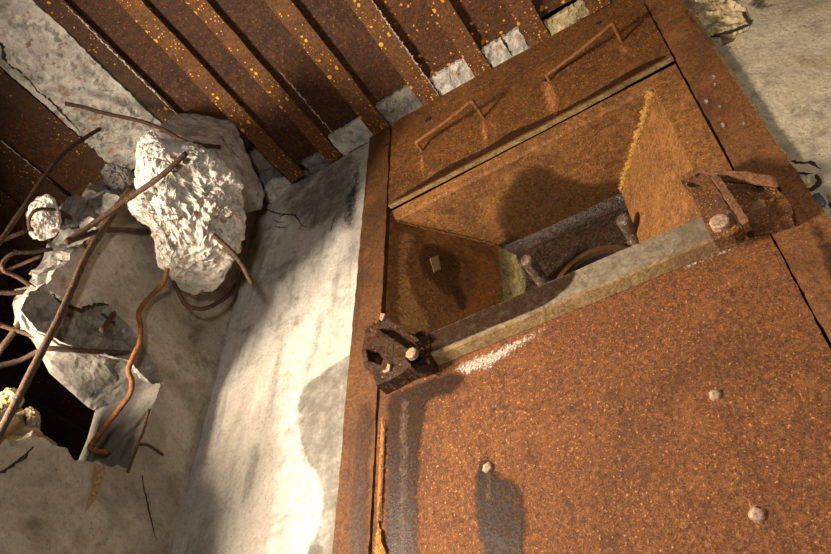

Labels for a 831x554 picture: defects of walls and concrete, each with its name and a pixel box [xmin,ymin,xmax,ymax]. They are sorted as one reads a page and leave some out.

rust [543,82,558,113]
damp [496,169,620,245]
crack [789,159,821,175]
spalling [21,291,164,384]
rust [397,234,429,334]
damp [419,244,574,352]
damp [298,360,349,554]
rust [375,417,387,554]
damp [386,336,535,554]